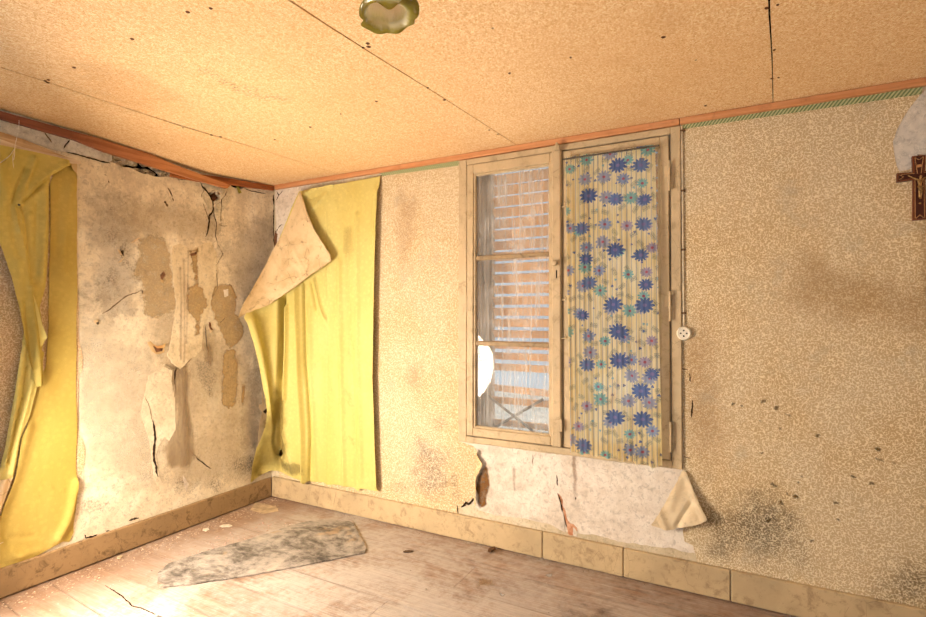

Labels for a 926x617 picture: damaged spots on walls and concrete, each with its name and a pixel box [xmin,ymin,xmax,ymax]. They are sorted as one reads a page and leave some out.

peeling [893,90,926,171]
spalling [202,183,240,222]
crack [200,182,282,295]
peeling [274,185,311,247]
peeling [141,242,228,490]
crack [169,318,225,397]
crack [145,398,158,476]
peeling [463,442,695,553]
crack [105,585,162,617]